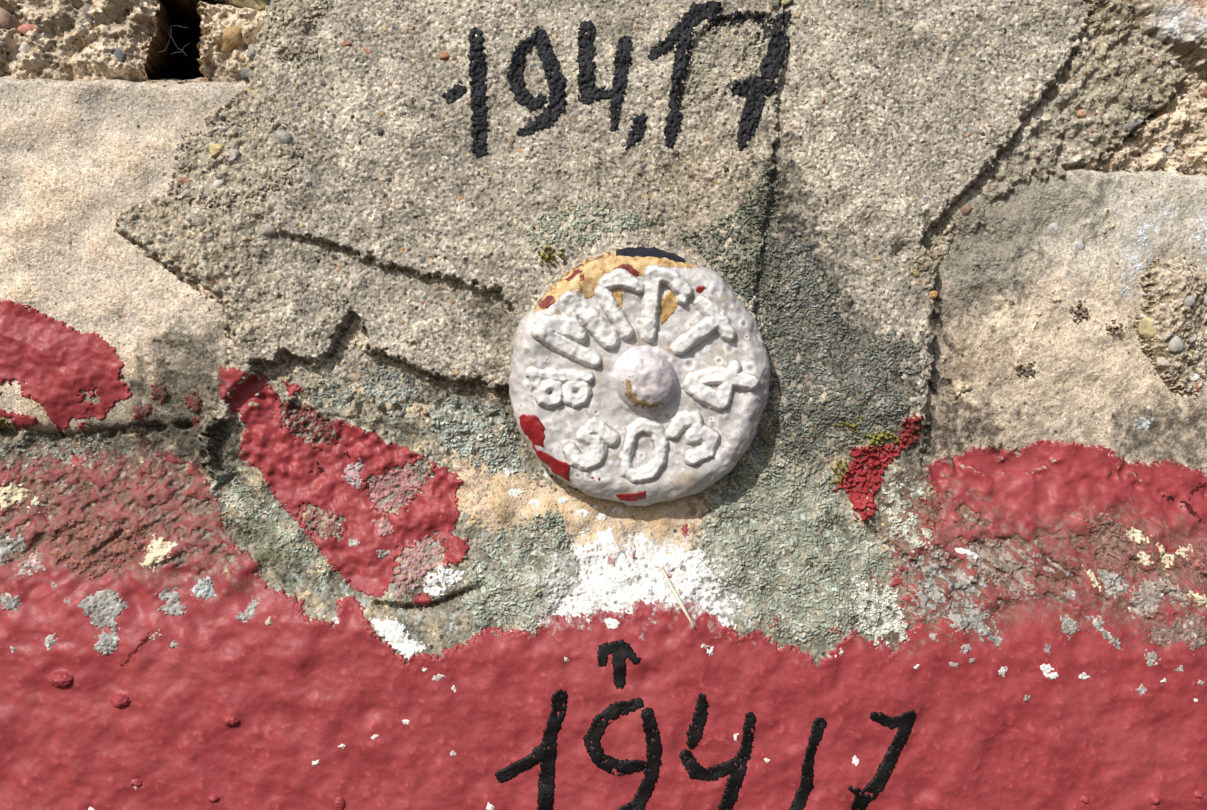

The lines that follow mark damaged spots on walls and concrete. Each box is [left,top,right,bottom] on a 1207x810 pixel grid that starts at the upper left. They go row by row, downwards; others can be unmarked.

peeling [0,300,202,434]
peeling [0,480,44,513]
peeling [216,365,470,609]
peeling [0,517,179,656]
peeling [155,576,217,616]
peeling [235,596,261,623]
peeling [1040,644,1059,680]
peeling [902,507,1207,668]